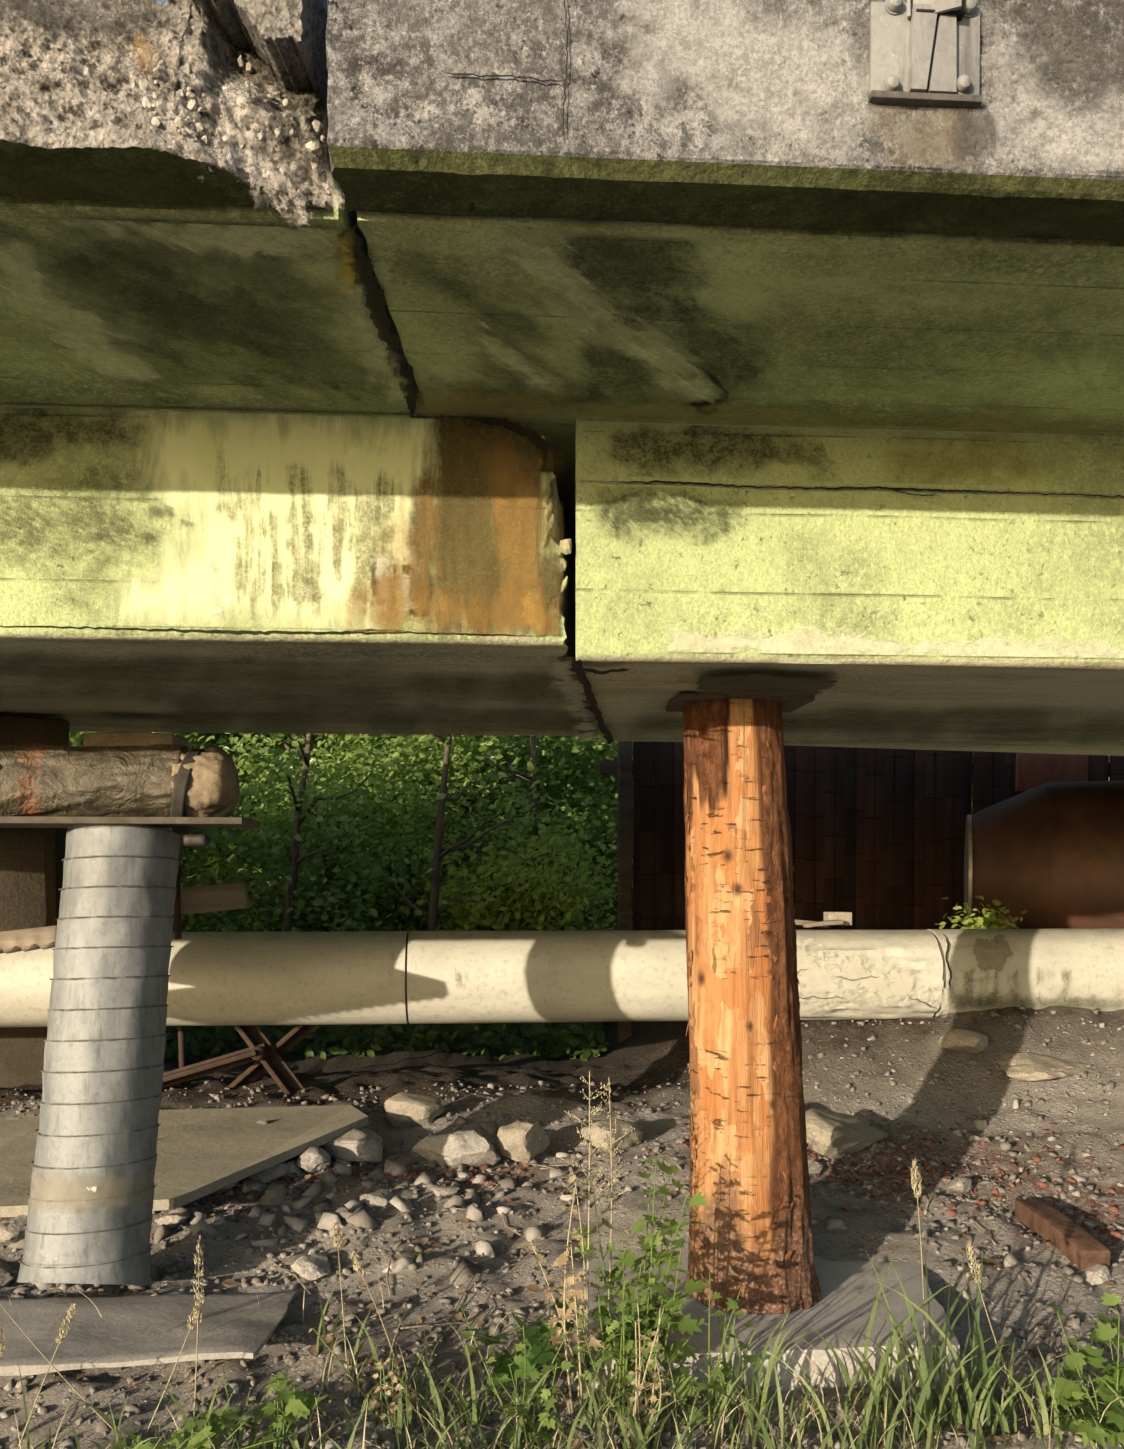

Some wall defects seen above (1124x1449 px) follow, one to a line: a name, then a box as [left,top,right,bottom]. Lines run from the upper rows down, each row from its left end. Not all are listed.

spalling [142,53,341,218]
crack [339,225,552,454]
corrosion [348,414,563,635]
leakage [0,220,1124,629]
crack [592,480,1124,498]
crack [570,660,630,744]